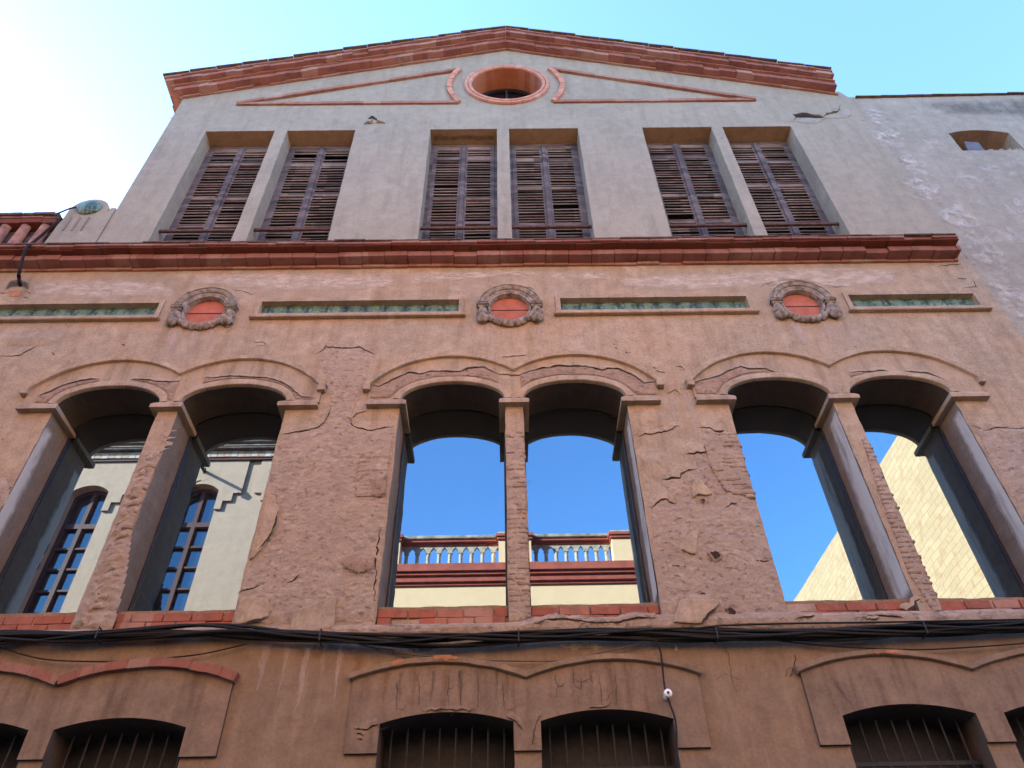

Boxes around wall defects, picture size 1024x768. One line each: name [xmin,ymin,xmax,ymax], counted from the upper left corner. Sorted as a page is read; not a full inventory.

crack [792,104,864,121]
crack [499,352,526,376]
flaking render [71,448,160,630]
flaking render [203,339,499,631]
flaking render [646,419,787,624]
flaking render [861,439,944,611]